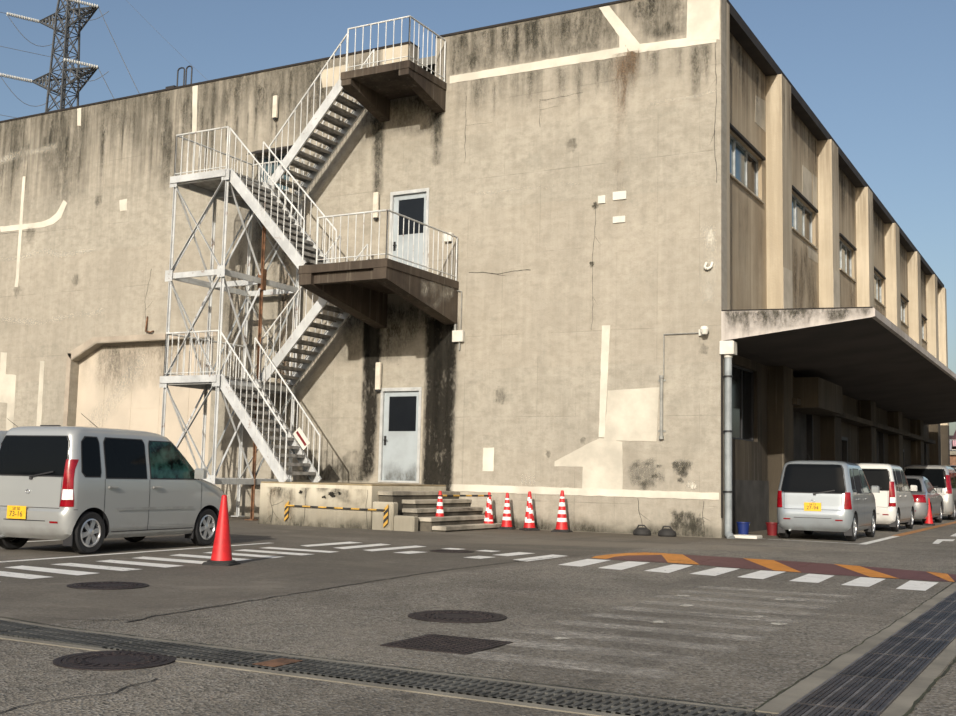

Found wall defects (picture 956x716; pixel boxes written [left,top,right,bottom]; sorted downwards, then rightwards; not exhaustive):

damp [453,30,493,71]
damp [505,9,605,59]
damp [640,0,677,36]
damp [295,61,326,107]
crack [589,208,599,326]
damp [302,305,456,498]